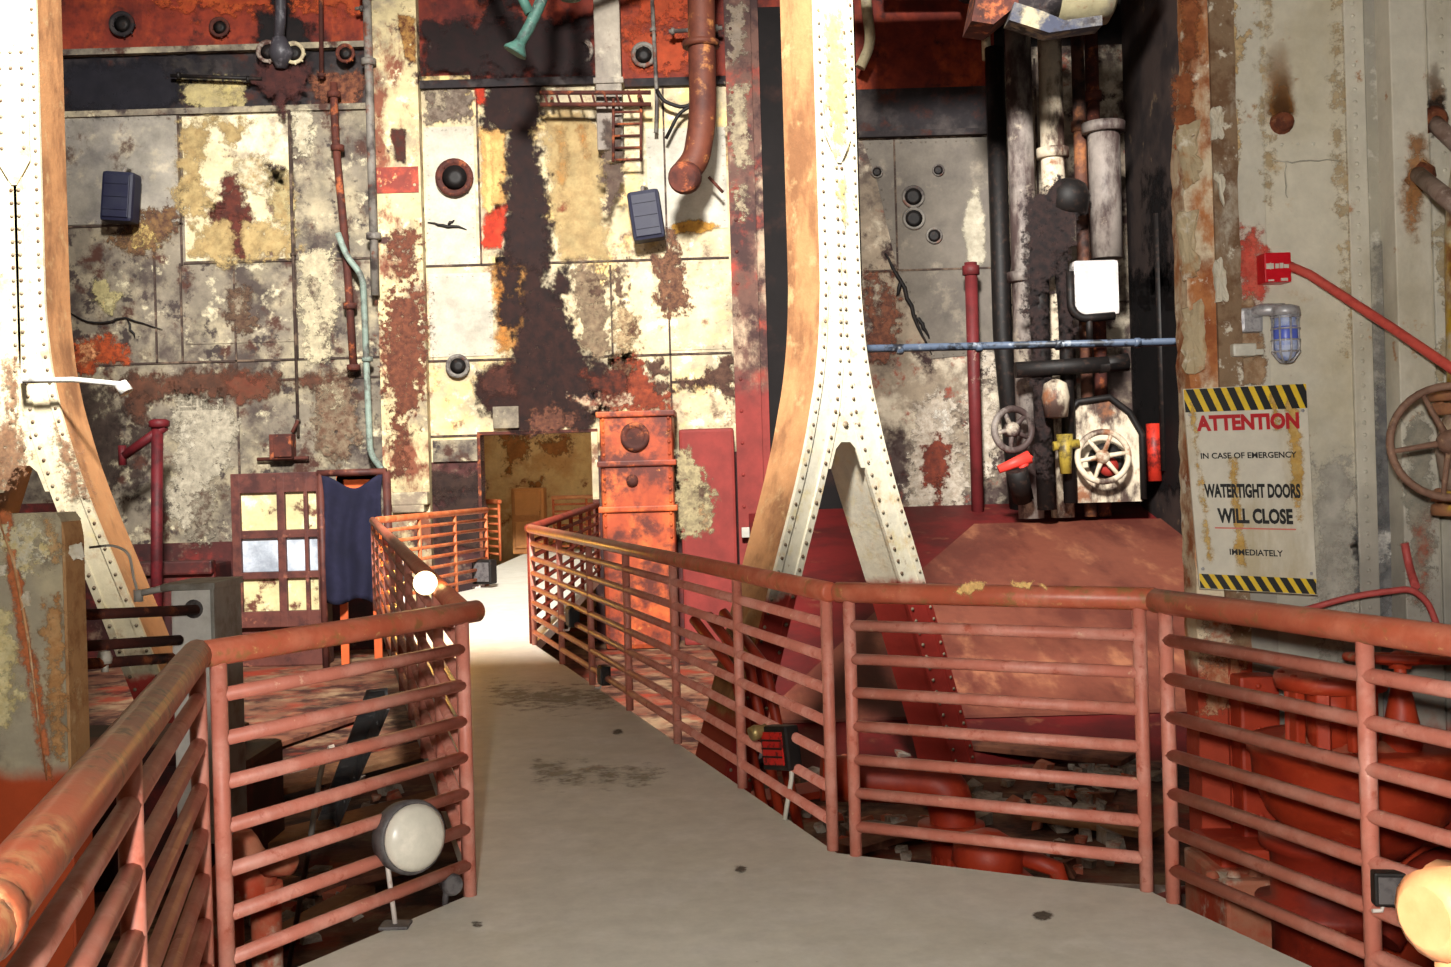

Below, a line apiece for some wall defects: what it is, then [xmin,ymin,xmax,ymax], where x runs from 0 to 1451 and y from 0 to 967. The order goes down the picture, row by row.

peeling [106,74,340,366]
corrosion [154,0,363,24]
corrosion [390,128,406,163]
corrosion [398,14,416,62]
corrosion [1171,0,1205,150]
corrosion [73,332,365,469]
corrosion [374,223,437,480]
corrosion [431,73,735,558]
corrosion [862,268,905,369]
corrosion [919,431,953,506]
peeling [0,514,85,729]
corrosion [0,353,96,781]